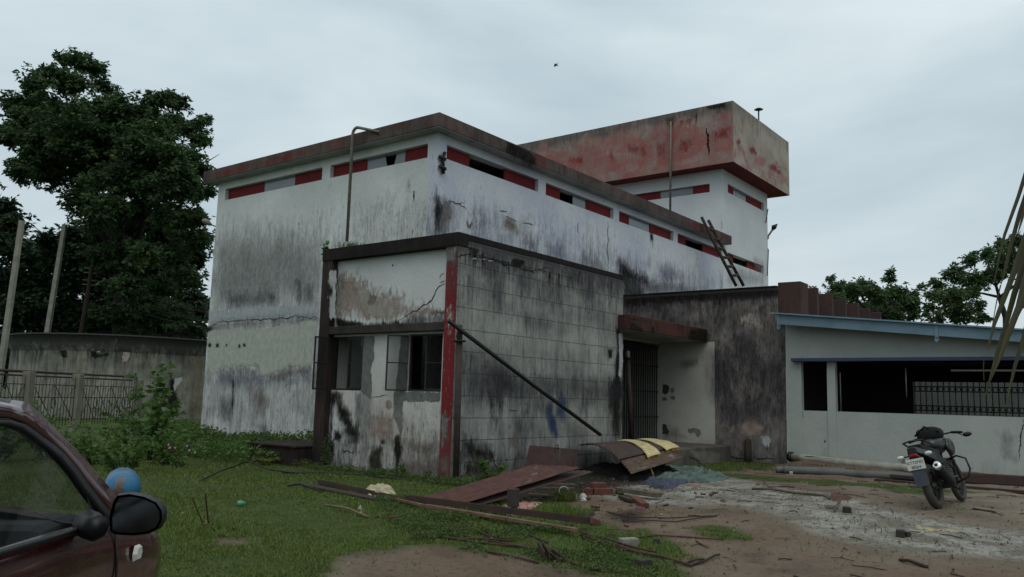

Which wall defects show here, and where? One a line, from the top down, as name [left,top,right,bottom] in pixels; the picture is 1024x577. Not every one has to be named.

damp [434,197,446,230]
crack [211,269,338,328]
peeling [328,270,452,336]
crack [401,254,552,320]
damp [678,322,708,343]
damp [608,329,623,439]
damp [328,391,369,461]
damp [394,436,402,474]
damp [463,439,493,465]